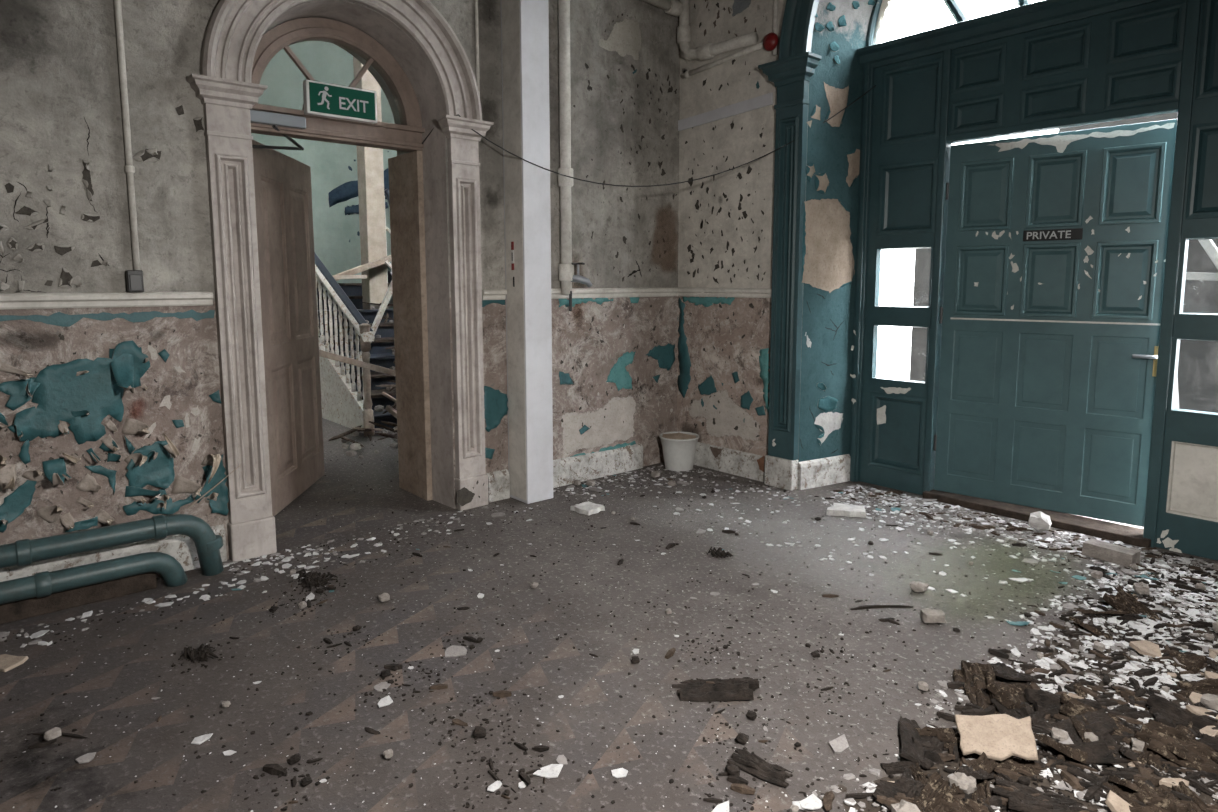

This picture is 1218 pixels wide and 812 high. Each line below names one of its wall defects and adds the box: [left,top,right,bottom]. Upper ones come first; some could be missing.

peeling [694,0,764,37]
peeling [814,0,880,65]
peeling [0,164,83,288]
peeling [81,158,100,222]
peeling [605,64,677,176]
flaking render [807,81,850,128]
flaking render [802,163,855,293]
flaking render [846,149,860,187]
flaking render [558,121,776,473]
peeling [0,309,229,533]